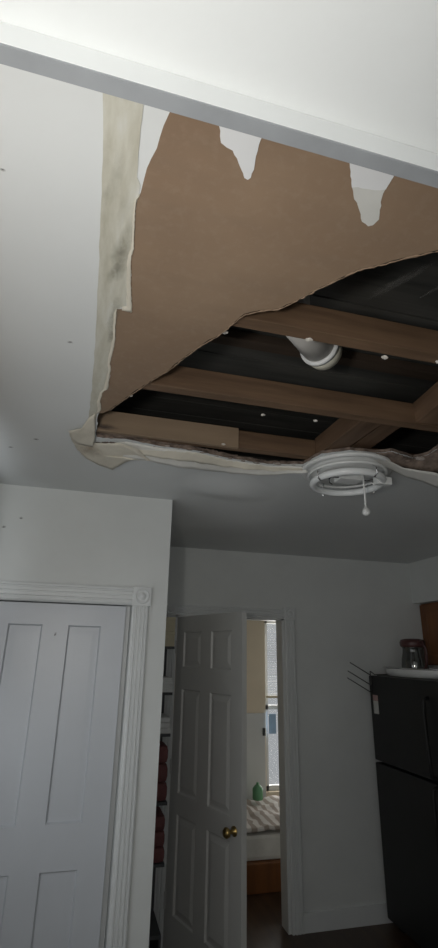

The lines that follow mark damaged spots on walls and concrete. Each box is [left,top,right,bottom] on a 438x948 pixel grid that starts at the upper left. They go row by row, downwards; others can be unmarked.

peeling [69,112,438,476]
peeling [375,456,438,488]